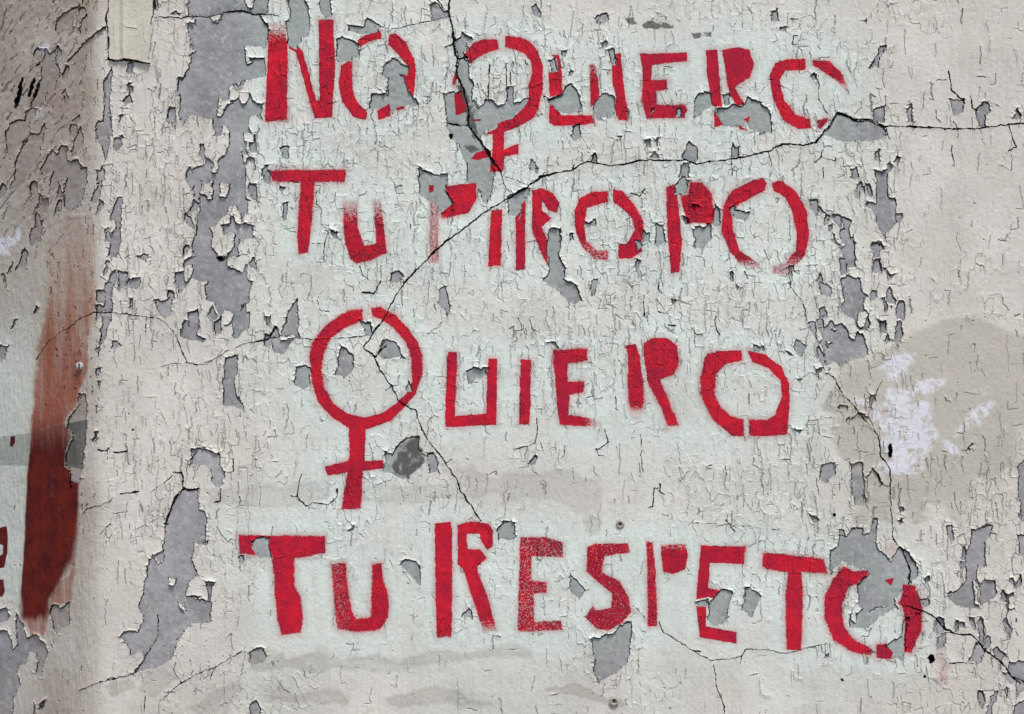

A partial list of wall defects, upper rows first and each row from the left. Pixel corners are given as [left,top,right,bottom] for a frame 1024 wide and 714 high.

rust [51,78,80,145]
rust [31,179,105,398]
peeling [153,0,312,416]
peeling [416,30,541,220]
crack [36,0,1024,531]
peeling [781,100,907,389]
crack [82,448,235,536]
peeling [116,444,228,676]
peeling [587,620,635,685]
peeling [806,458,1024,714]
water stain [815,308,1024,532]
crack [825,373,1024,684]